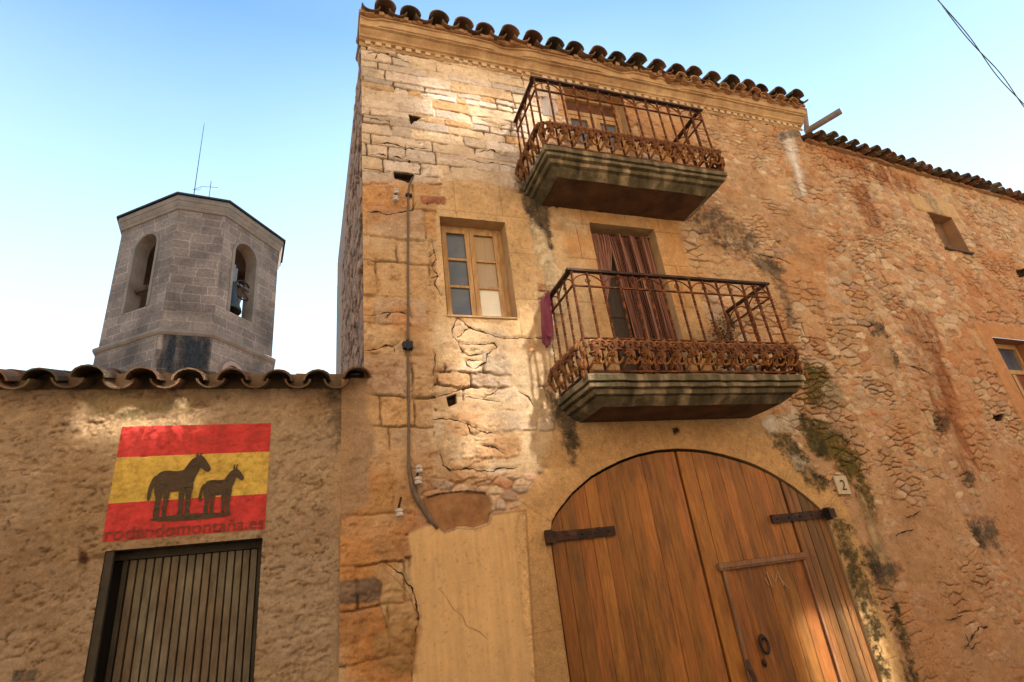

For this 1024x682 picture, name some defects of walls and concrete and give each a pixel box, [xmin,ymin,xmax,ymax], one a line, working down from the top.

leakage [780,130,802,140]
crack [428,242,439,291]
leakage [516,180,569,357]
leakage [157,334,211,373]
leakage [547,391,580,464]
leakage [761,407,833,492]
leakage [851,465,918,682]
crack [386,563,483,678]